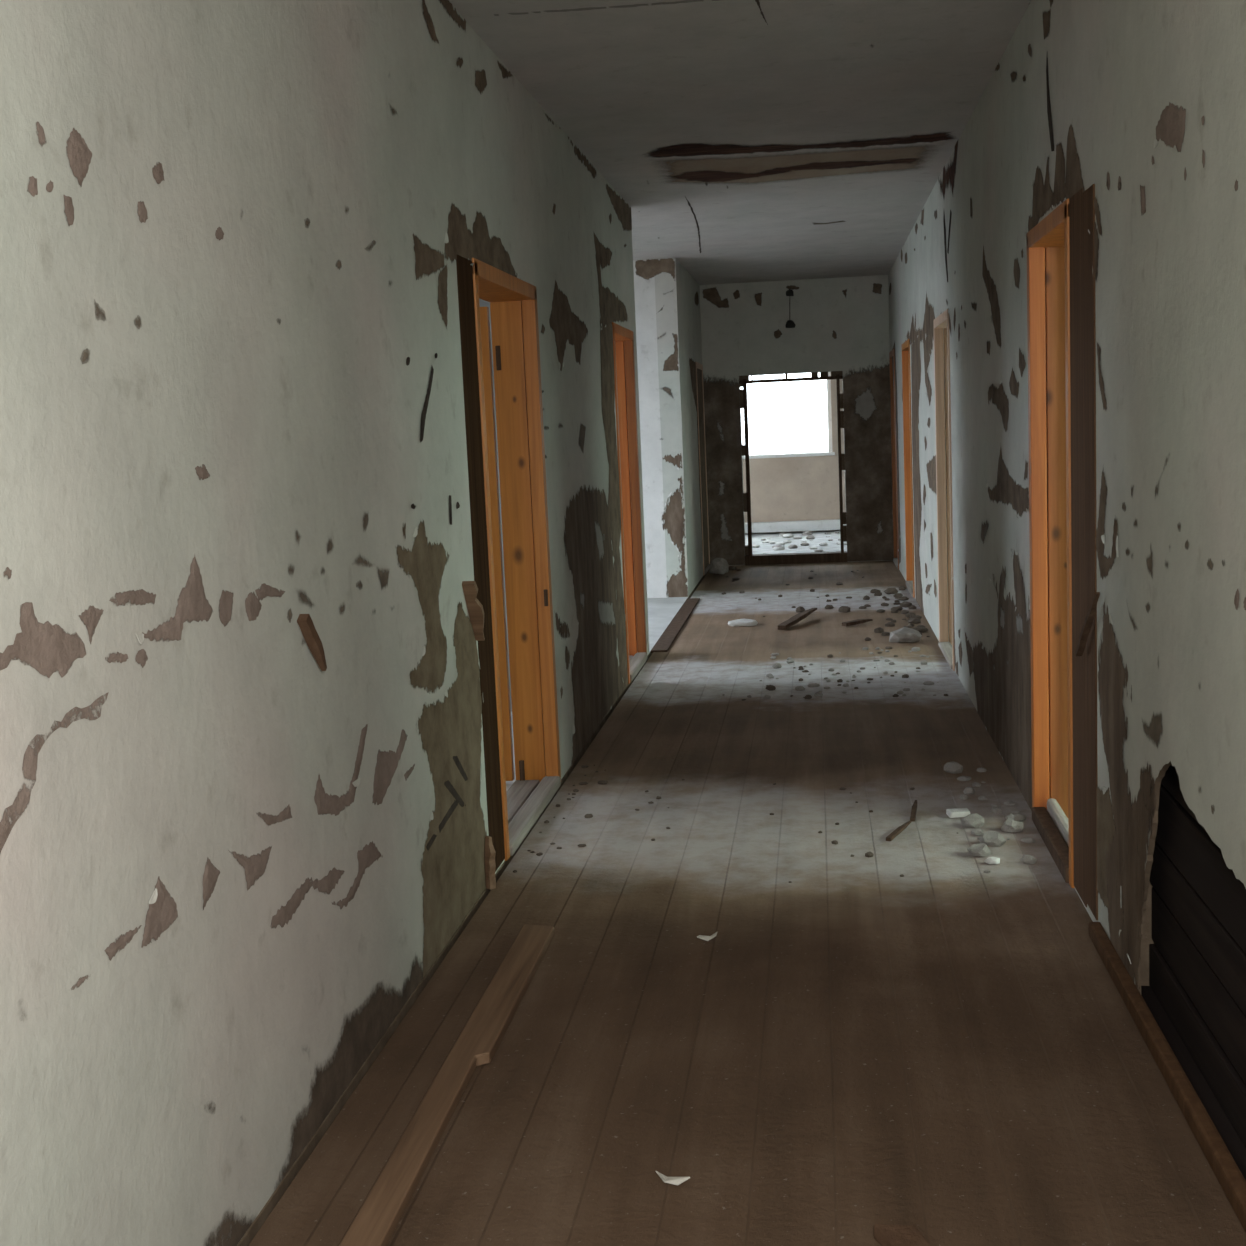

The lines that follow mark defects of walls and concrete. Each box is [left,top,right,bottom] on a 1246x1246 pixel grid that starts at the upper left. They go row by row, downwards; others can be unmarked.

flaking render [413,203,519,327]
flaking render [1014,124,1102,288]
flaking render [541,134,632,765]
flaking render [986,349,1029,518]
flaking render [0,692,109,854]
flaking render [0,589,156,678]
flaking render [105,555,312,668]
flaking render [314,520,487,979]
flaking render [954,550,1032,811]
flaking render [104,876,178,961]
flaking render [271,841,383,929]
flaking render [1097,602,1246,1180]